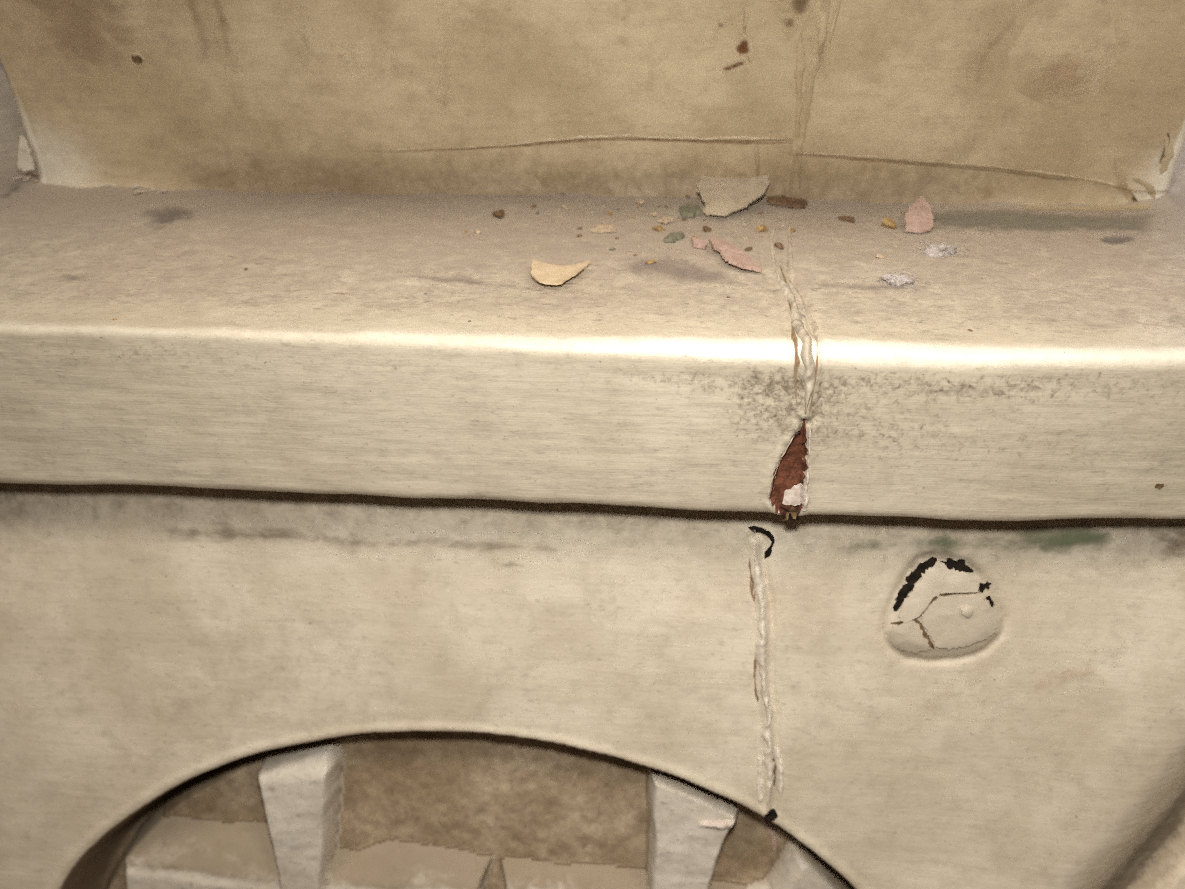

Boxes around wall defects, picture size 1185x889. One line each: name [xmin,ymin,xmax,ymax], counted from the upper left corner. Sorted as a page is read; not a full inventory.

crack [358,0,1139,191]
crack [769,218,819,415]
peeling [768,419,811,521]
crack [699,526,785,854]